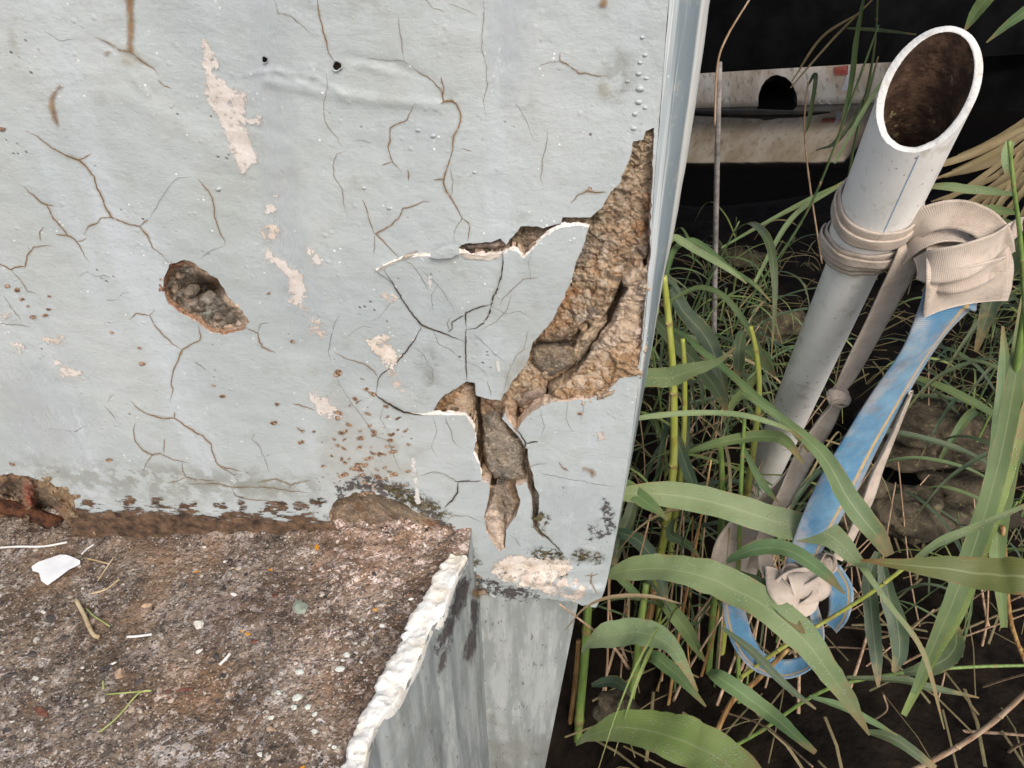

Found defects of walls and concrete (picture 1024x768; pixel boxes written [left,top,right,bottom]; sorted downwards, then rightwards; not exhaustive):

crack [96,37,170,88]
peeling [201,39,262,174]
crack [276,0,333,59]
spalling [4,284,51,320]
crack [0,133,305,501]
peeling [260,192,326,340]
crack [324,0,533,523]
spalling [434,124,660,602]
water stain [335,475,453,531]
crack [516,404,613,553]